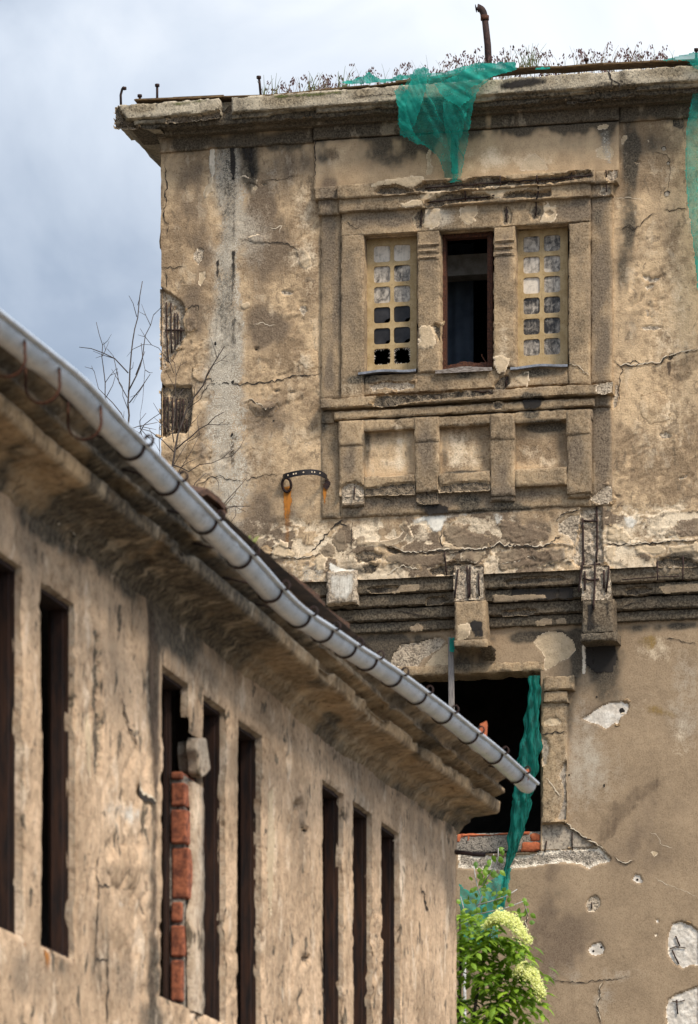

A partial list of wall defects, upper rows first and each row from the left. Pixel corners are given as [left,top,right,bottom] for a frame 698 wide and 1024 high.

spalling [371,149,592,230]
leakage [206,148,248,513]
flaking render [418,320,445,350]
crack [615,350,690,398]
corrosion [283,486,292,525]
spalling [314,481,698,670]
spalling [583,698,631,729]
crack [563,823,633,864]
spalling [655,920,698,968]
spalling [666,986,698,1024]